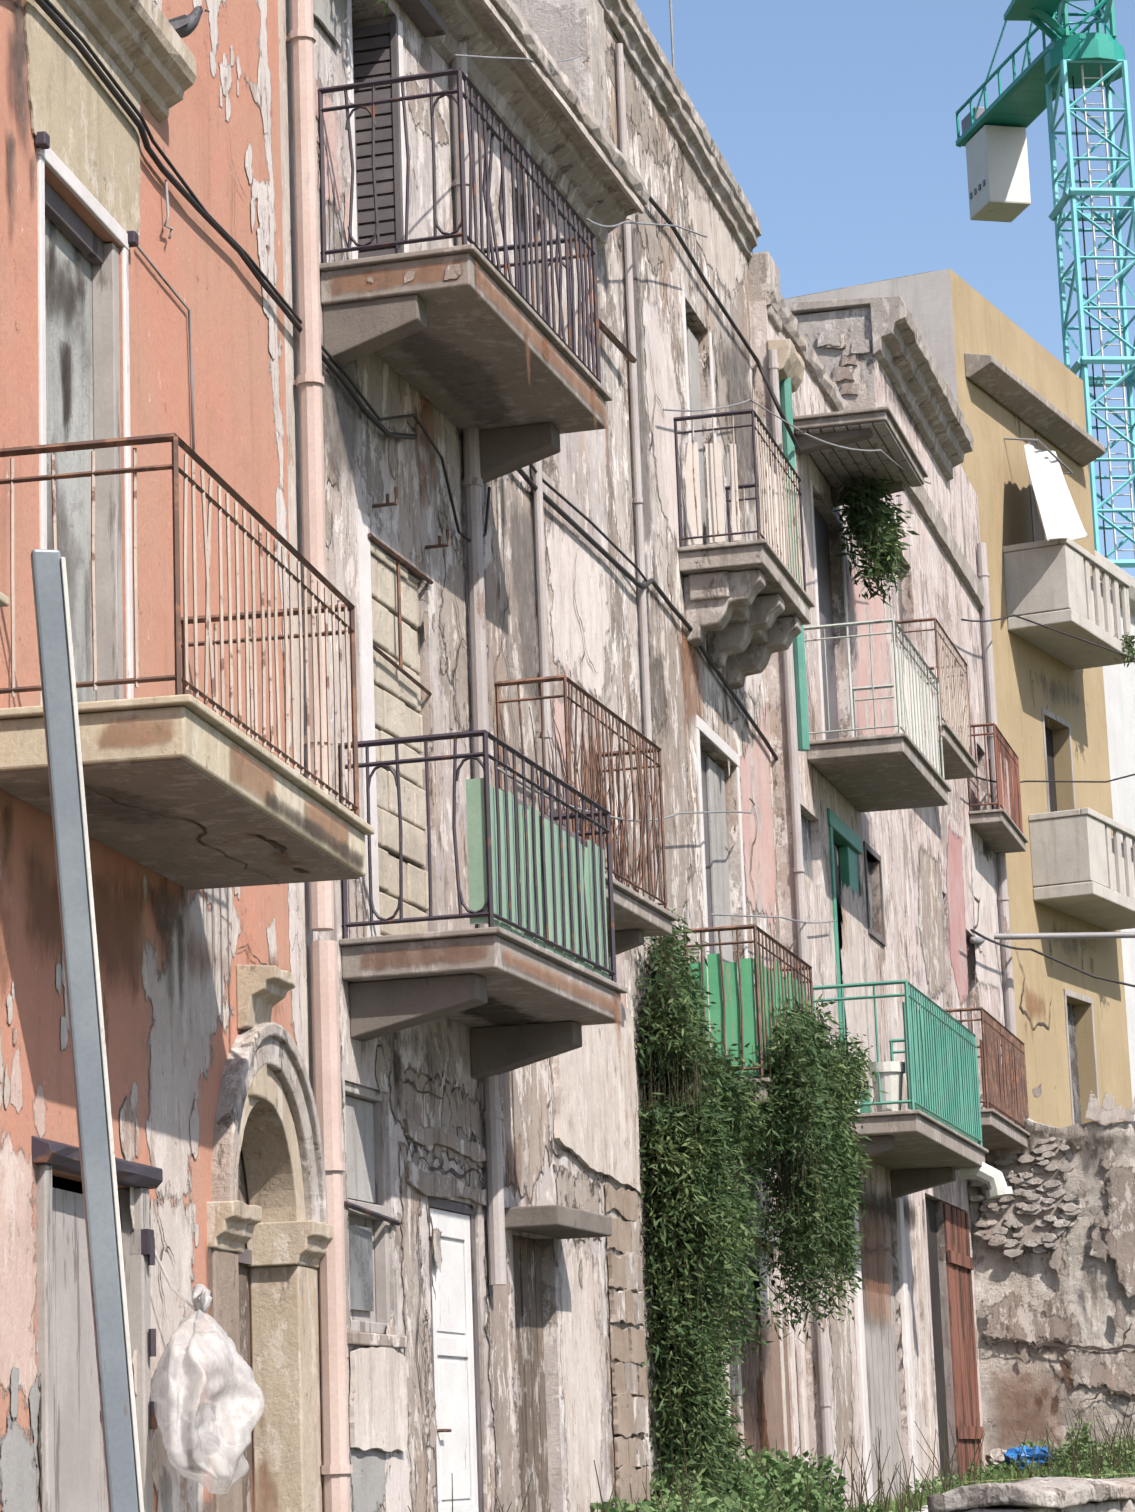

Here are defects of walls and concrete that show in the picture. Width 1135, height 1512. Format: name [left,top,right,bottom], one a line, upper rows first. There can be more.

peeling [193,0,292,766]
crack [85,786,309,886]
peeling [0,1128,40,1512]
peeling [0,981,46,1138]
peeling [120,887,247,1512]
peeling [267,883,307,1056]
peeling [339,1031,351,1359]
spalling [348,1032,651,1512]
crack [551,1094,648,1179]
spalling [969,1091,1135,1331]
peeling [980,1289,1135,1401]
crack [982,1323,1135,1403]